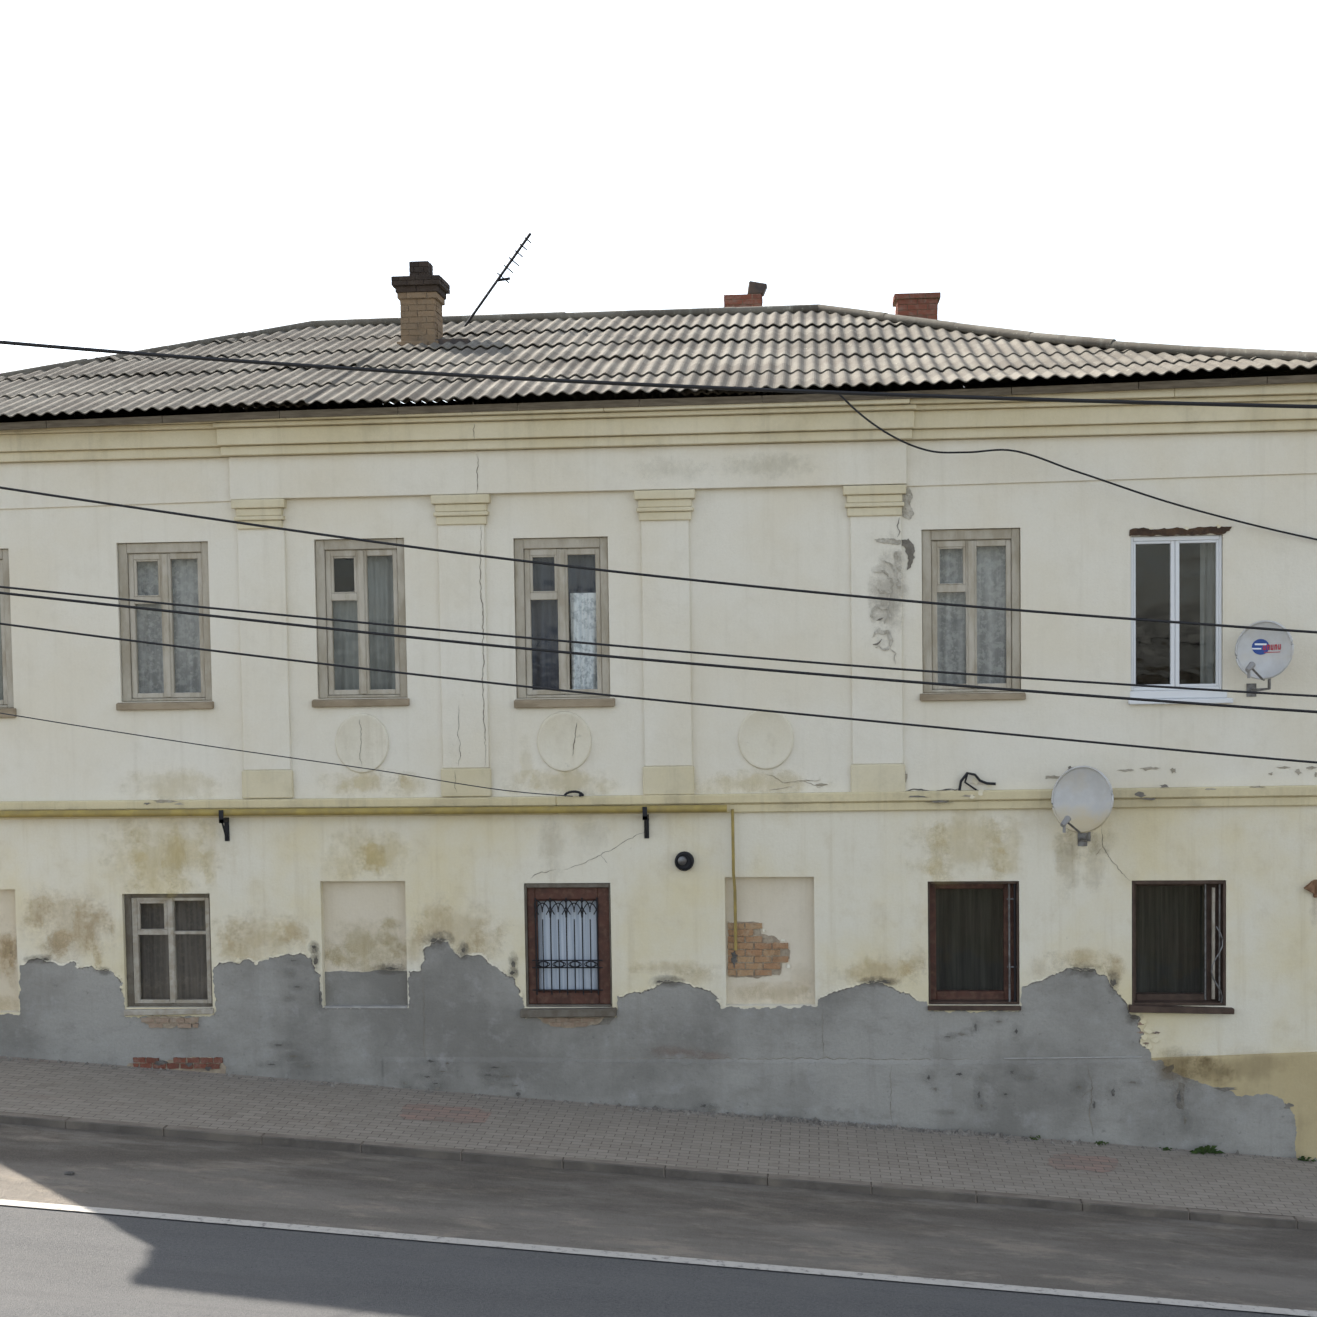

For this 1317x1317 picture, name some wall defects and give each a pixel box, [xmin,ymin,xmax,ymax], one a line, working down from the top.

spalling [870,488,915,664]
flaking render [727,921,790,979]
spalling [0,937,1297,1158]